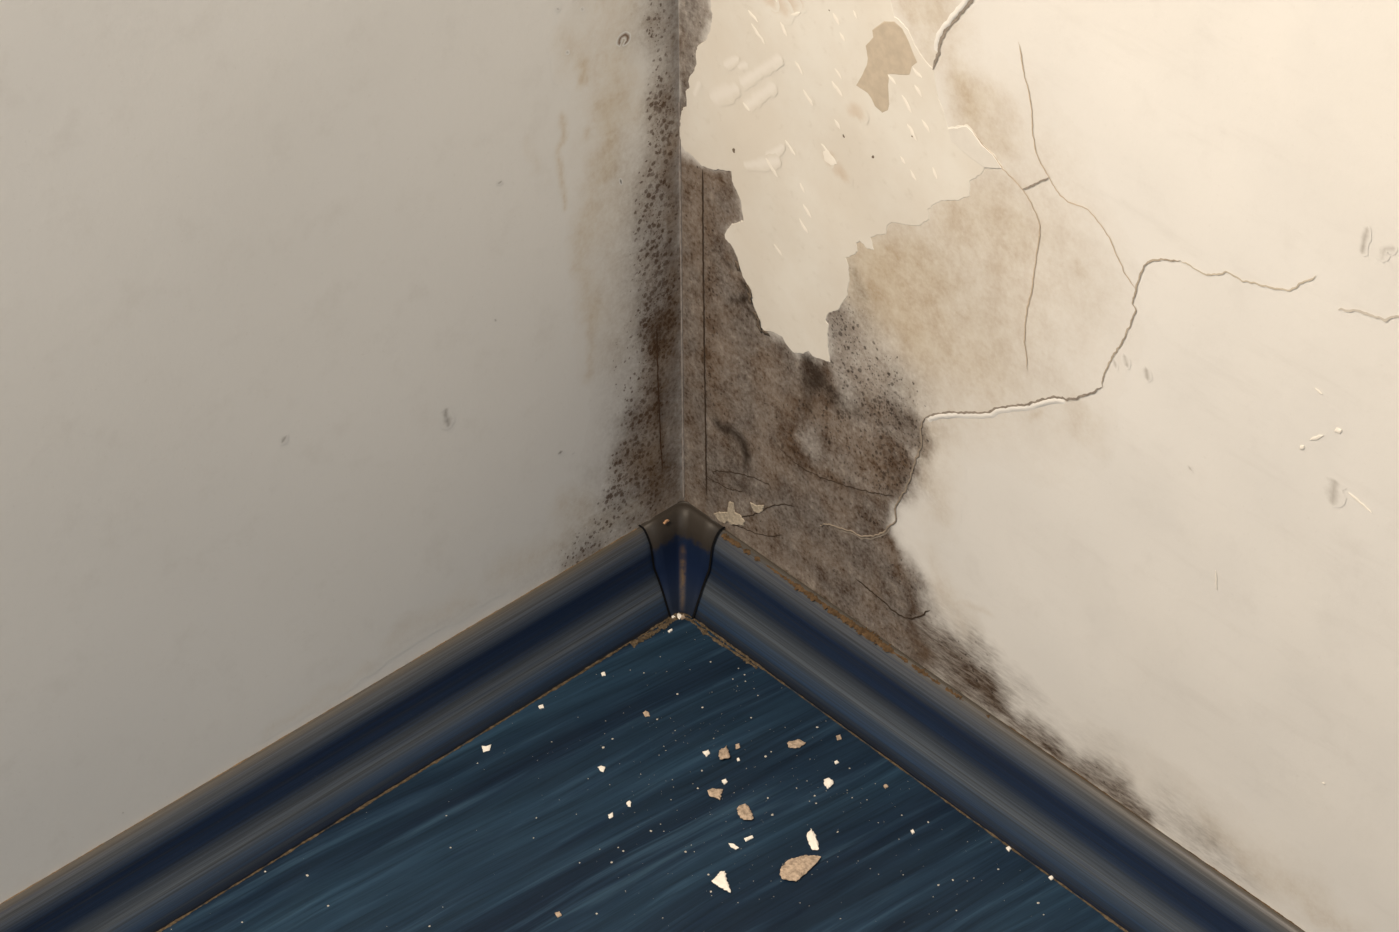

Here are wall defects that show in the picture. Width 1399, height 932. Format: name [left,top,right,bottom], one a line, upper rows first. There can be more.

crack [932,0,973,70]
peeling [680,0,1003,362]
crack [702,45,1315,540]
crack [1338,308,1399,322]
crack [655,330,663,470]
leakage [260,0,1379,932]
crack [855,578,930,620]